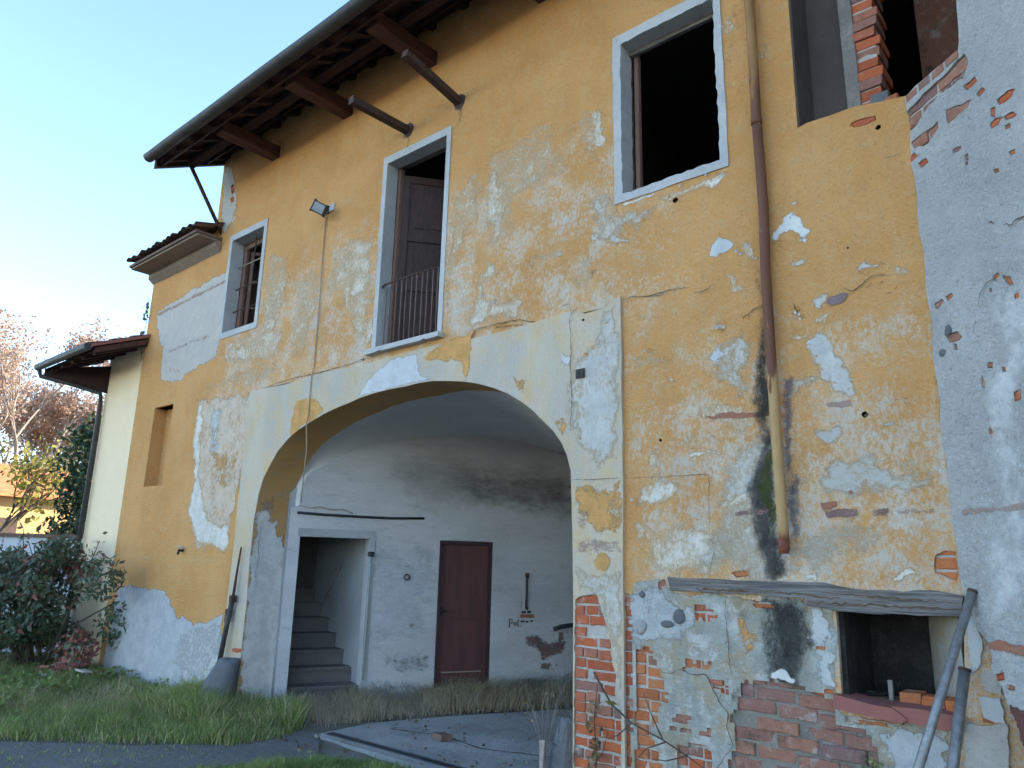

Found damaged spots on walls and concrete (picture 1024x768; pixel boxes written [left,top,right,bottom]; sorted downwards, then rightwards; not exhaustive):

flaking render [188,394,250,552]
flaking render [157,239,373,383]
peeling [360,262,522,396]
crack [468,319,535,332]
peeling [561,308,665,467]
crack [626,283,716,299]
leakage [747,327,799,580]
peeling [101,496,286,700]
crack [661,603,734,768]
flaking render [526,436,949,768]
leakage [762,599,814,687]
flaking render [964,614,1024,768]